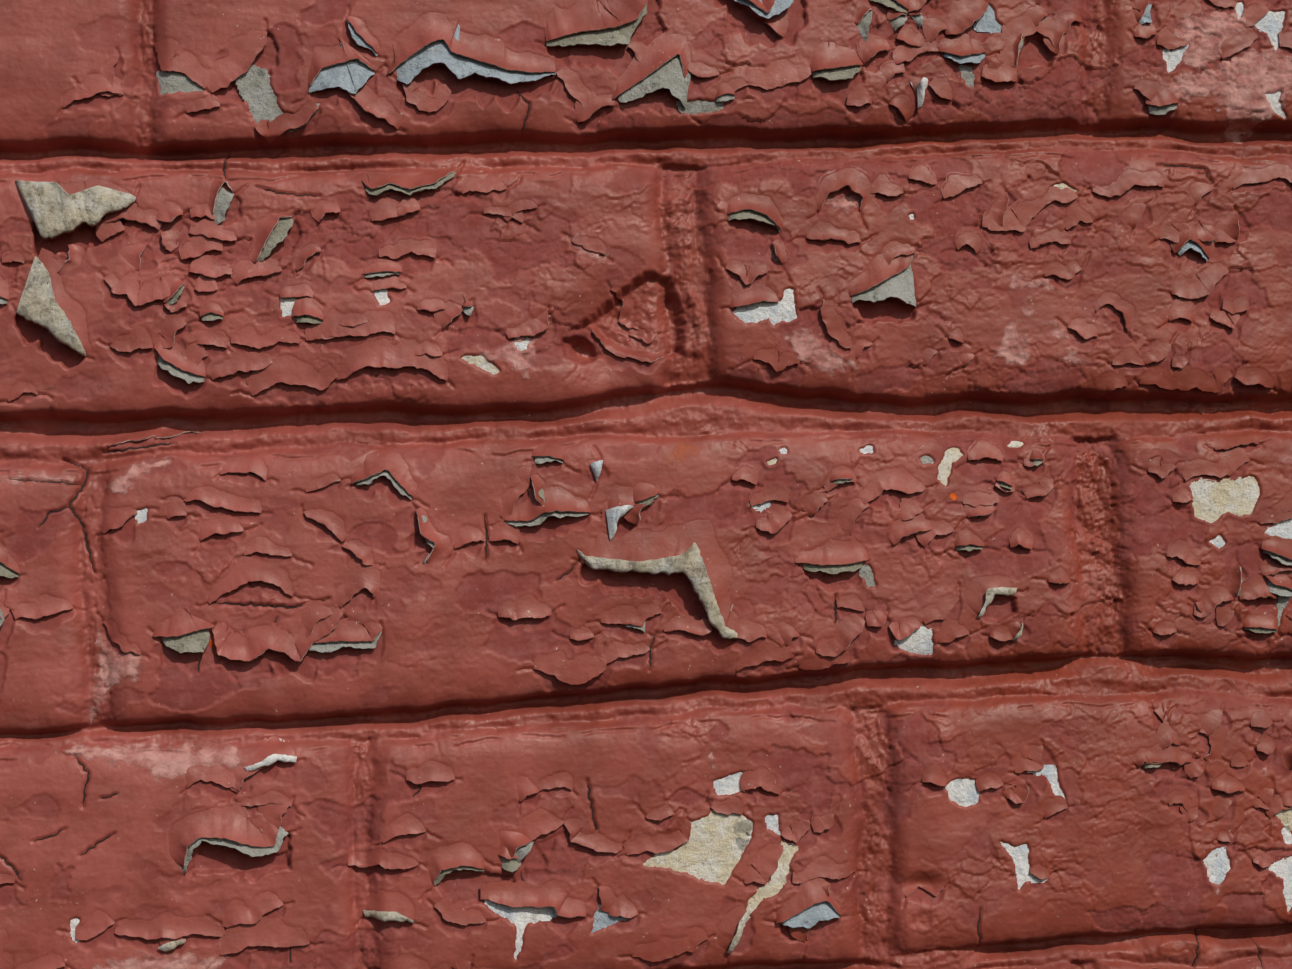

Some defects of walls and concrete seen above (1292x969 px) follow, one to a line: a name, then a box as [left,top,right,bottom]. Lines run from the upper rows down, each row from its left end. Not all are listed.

peeling [154,0,1082,144]
peeling [0,156,437,396]
peeling [725,190,797,325]
peeling [820,241,916,358]
peeling [955,164,1249,330]
peeling [498,437,1055,685]
peeling [1148,429,1292,635]
peeling [168,736,297,874]
peeling [348,712,892,962]
peeling [922,745,1068,818]
peeling [1000,842,1049,890]
peeling [1135,701,1292,912]